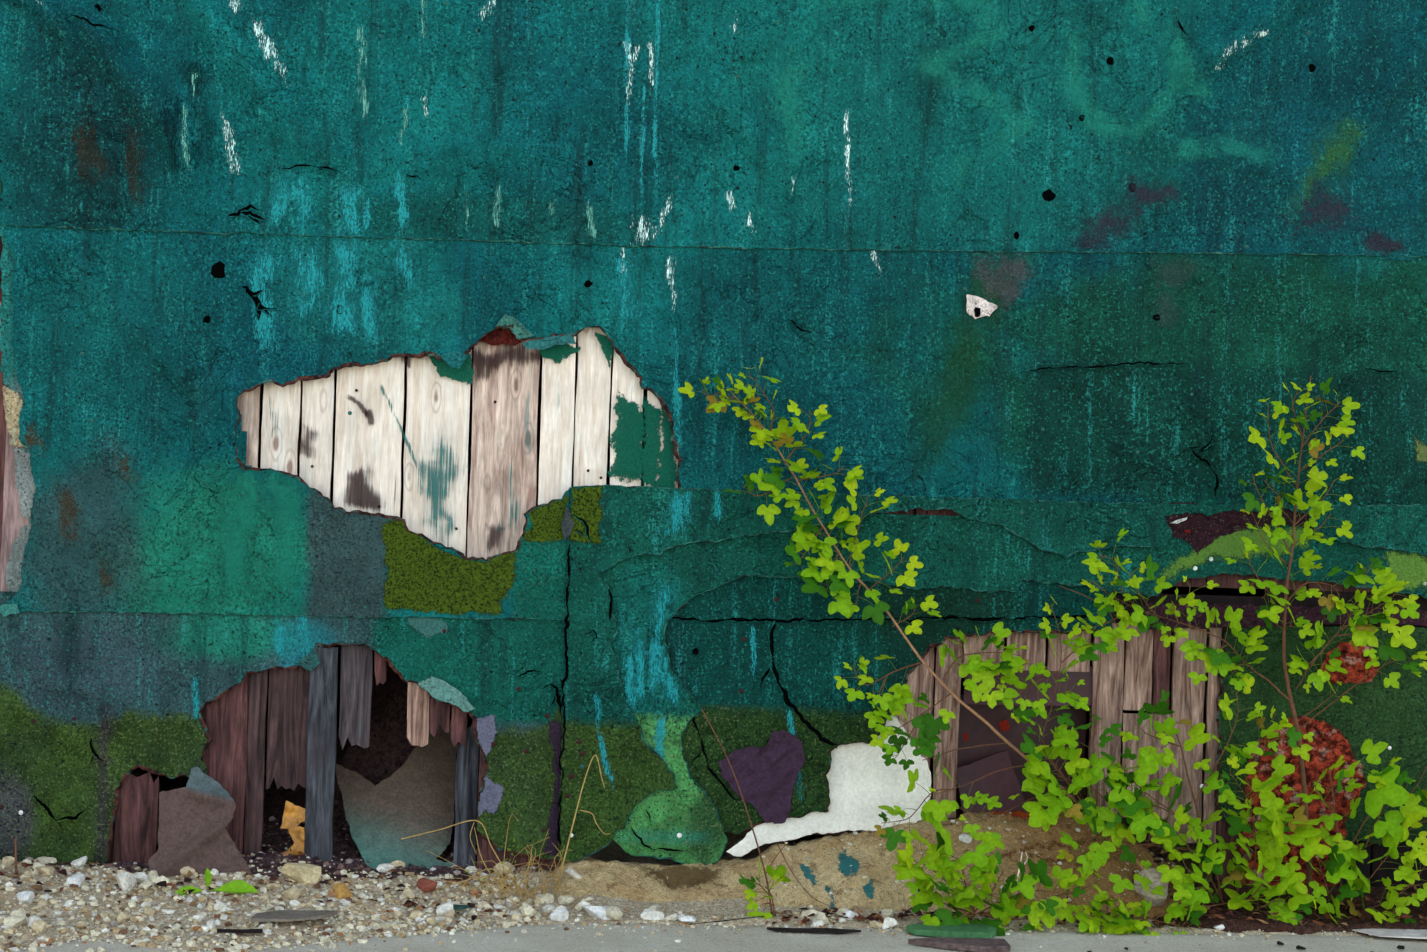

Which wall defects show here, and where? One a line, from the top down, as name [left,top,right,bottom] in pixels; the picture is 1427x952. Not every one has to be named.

damp [163,60,214,174]
peeling [966,294,998,319]
peeling [440,351,468,369]
peeling [479,313,581,363]
peeling [595,332,614,368]
peeling [381,392,677,638]
damp [271,616,317,661]
crack [517,515,613,853]
crack [670,614,1096,748]
peeling [418,676,497,756]
peeling [478,775,504,816]